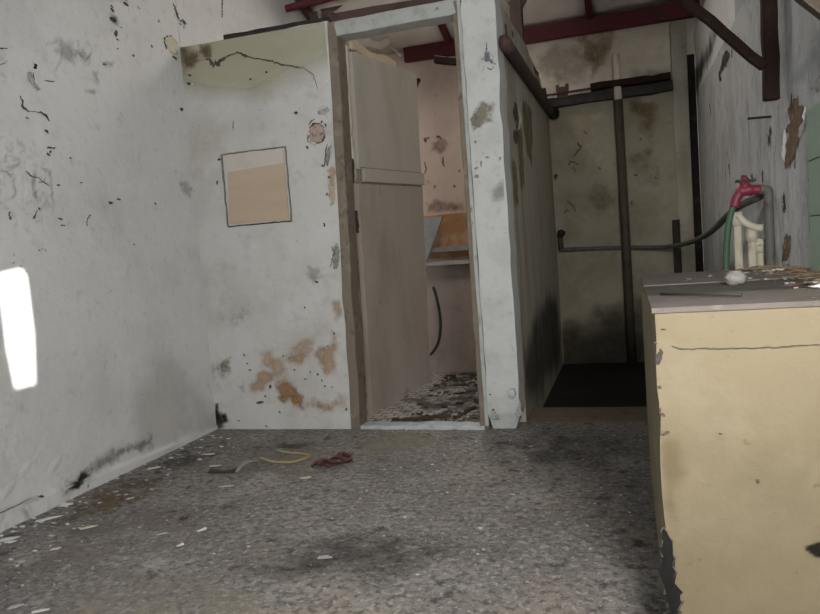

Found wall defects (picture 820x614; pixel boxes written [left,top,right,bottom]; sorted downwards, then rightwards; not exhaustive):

crack [191,51,318,89]
peeling [306,106,335,206]
damp [512,102,532,206]
peeling [330,242,340,270]
damp [70,473,88,489]